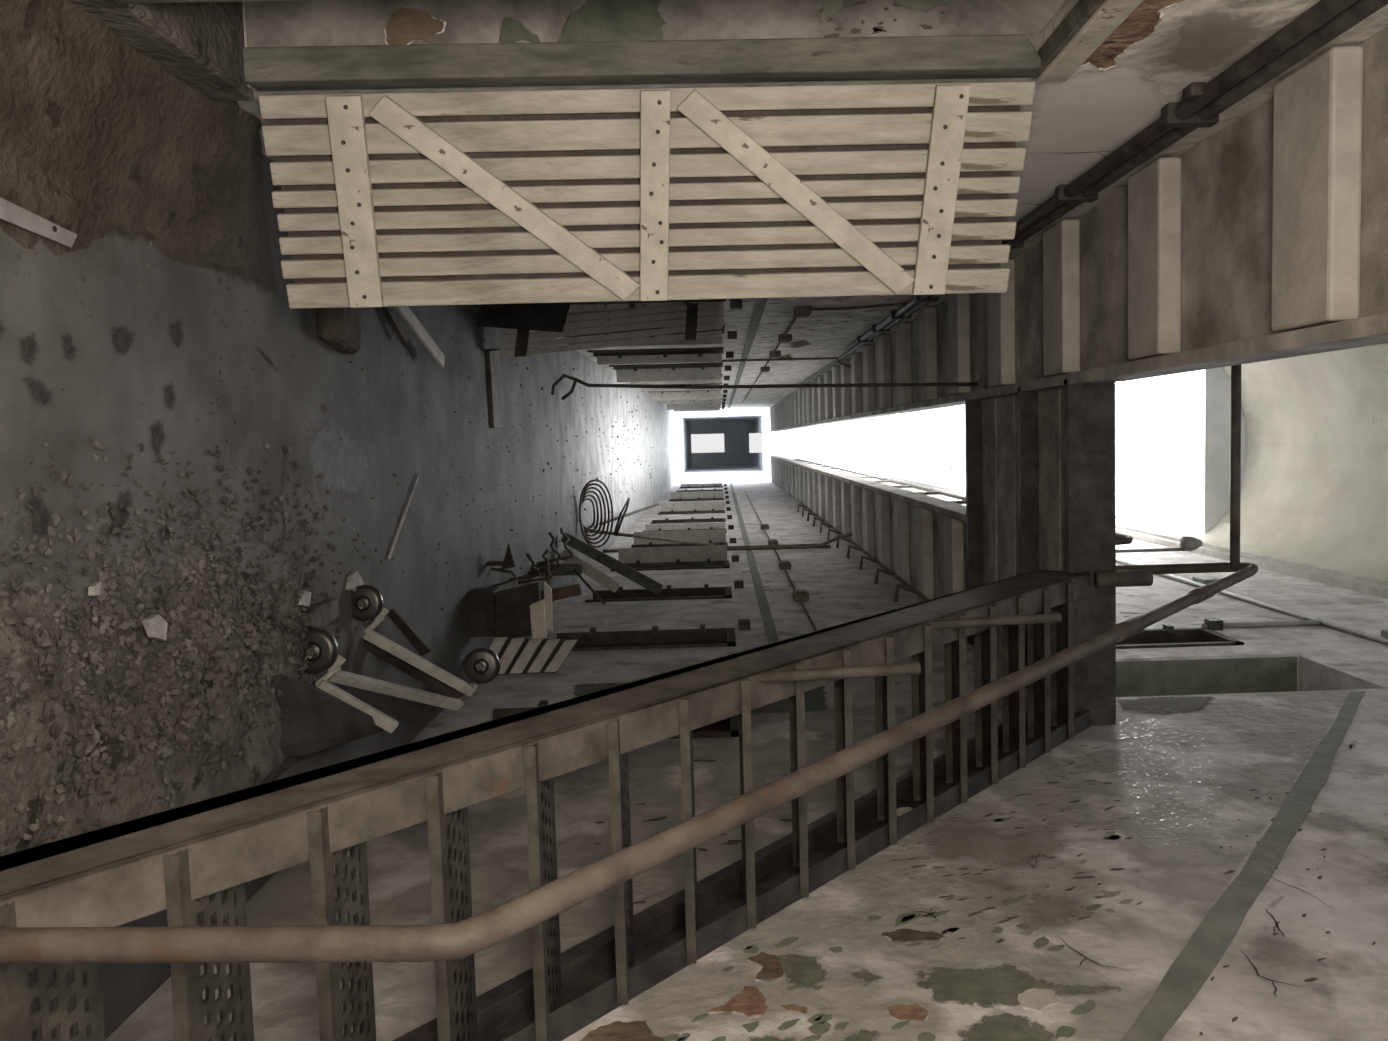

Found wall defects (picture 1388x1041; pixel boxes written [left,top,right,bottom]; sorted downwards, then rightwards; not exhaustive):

peeling [498,17,540,43]
peeling [558,0,667,42]
peeling [819,0,952,38]
spalling [1080,0,1184,71]
peeling [948,745,1133,841]
damp [1114,696,1220,849]
peeling [579,830,1142,1041]